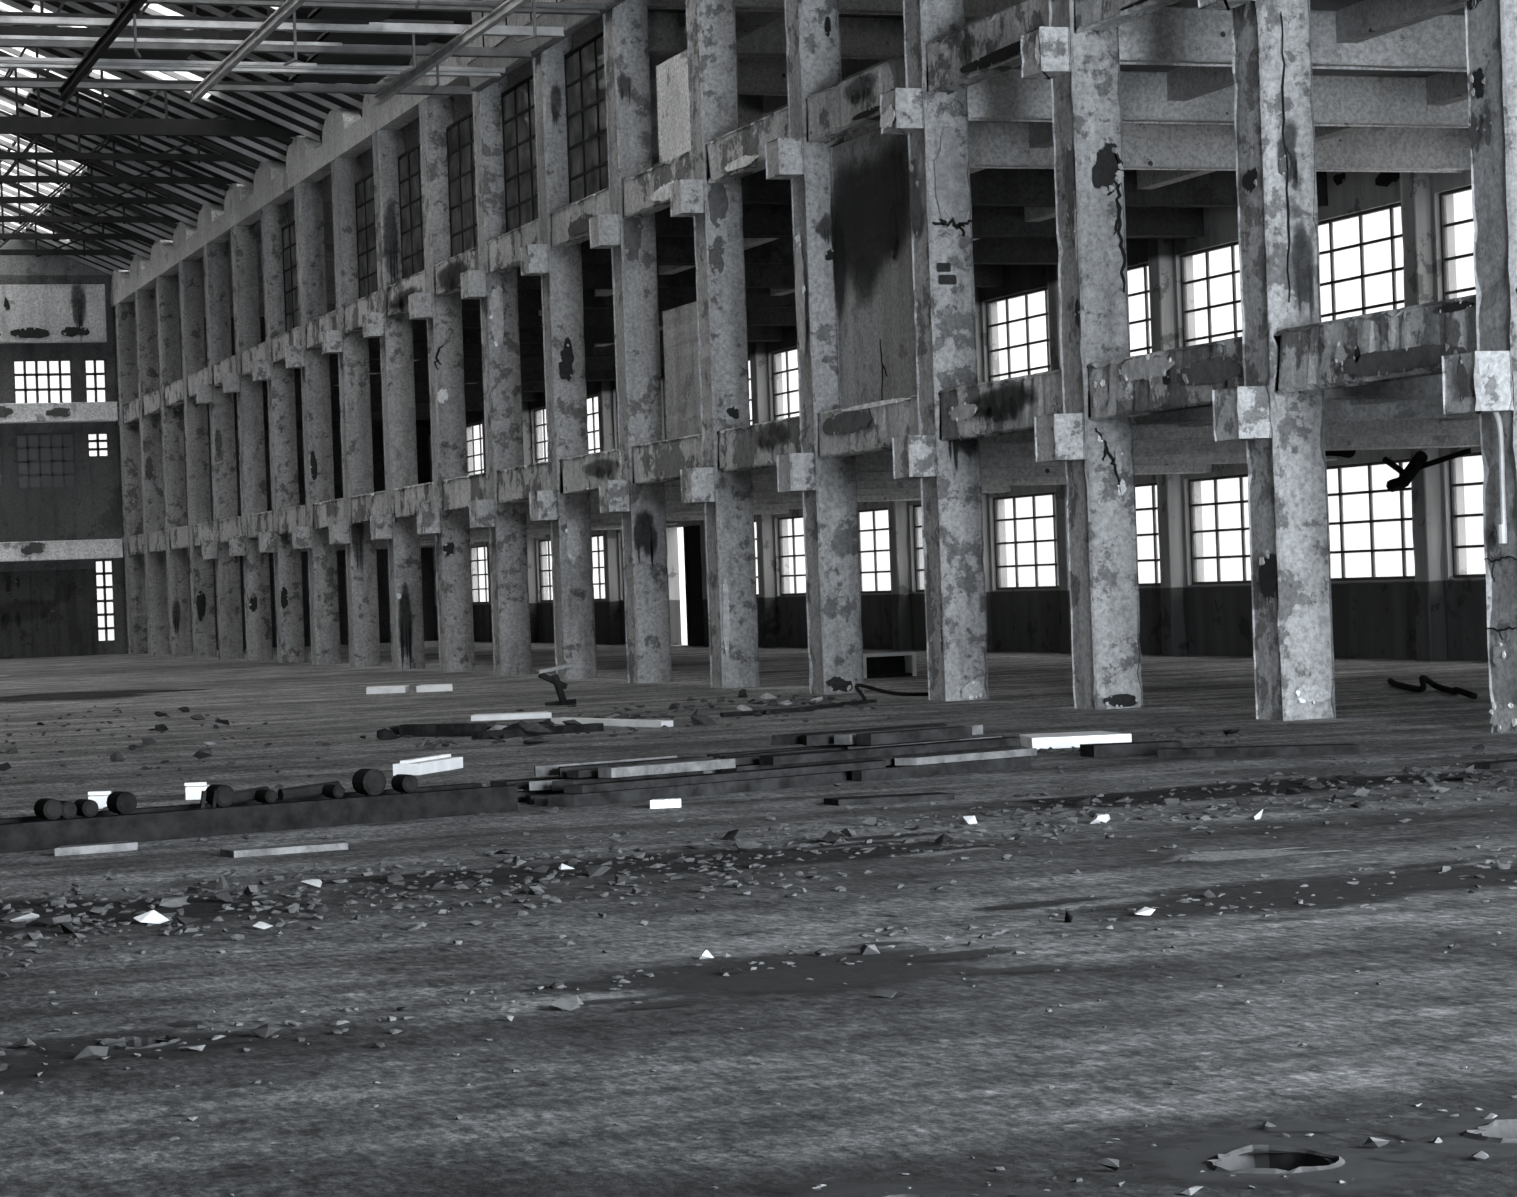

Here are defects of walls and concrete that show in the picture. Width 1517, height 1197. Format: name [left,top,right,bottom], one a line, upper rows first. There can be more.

spalling [1093,143,1124,192]
peeling [1065,143,1077,262]
spalling [559,337,574,381]
peeling [1093,354,1241,410]
peeling [1335,341,1469,402]
peeling [948,402,978,422]